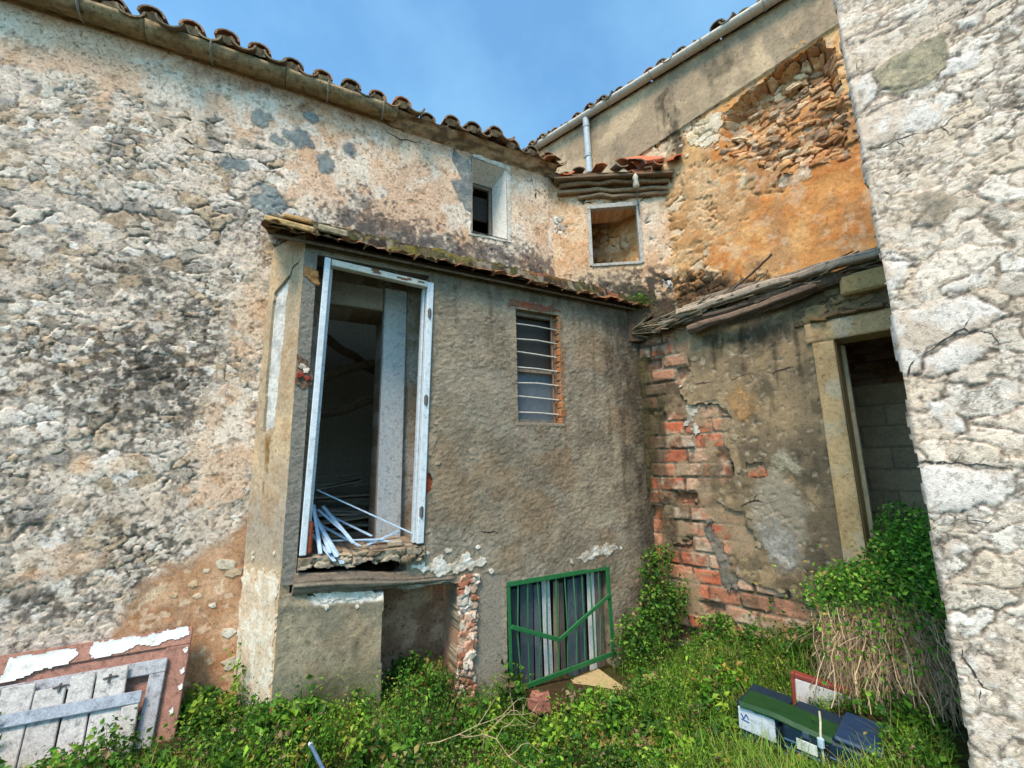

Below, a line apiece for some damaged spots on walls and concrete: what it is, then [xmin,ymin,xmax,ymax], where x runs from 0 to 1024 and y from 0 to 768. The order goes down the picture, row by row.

spalling [679,39,859,248]
crack [907,320,999,376]
spalling [411,545,494,707]
peeling [570,542,622,564]
flaking render [639,327,824,652]
crack [913,453,995,467]